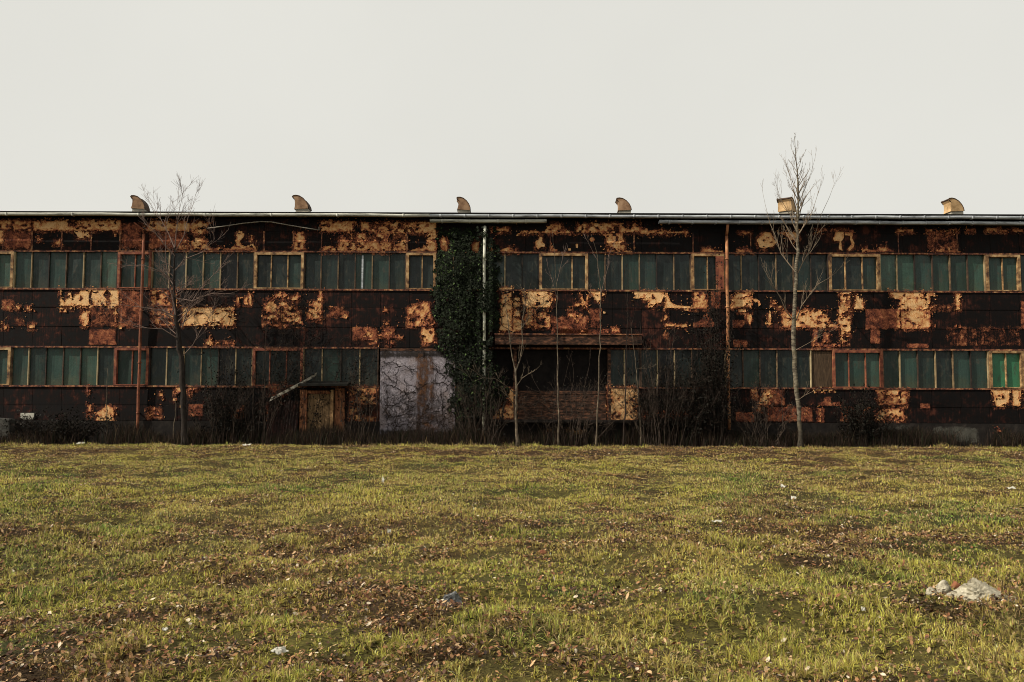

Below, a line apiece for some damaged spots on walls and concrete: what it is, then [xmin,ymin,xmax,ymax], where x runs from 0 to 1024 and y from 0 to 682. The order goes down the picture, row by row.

peeling [290,218,450,255]
peeling [57,285,122,329]
rust [89,290,140,345]
peeling [147,285,333,347]
rust [327,307,395,340]
peeling [632,289,710,338]
peeling [730,288,865,349]
rust [865,309,898,344]
peeling [887,288,962,332]
rust [947,301,1024,346]
crack [380,360,454,431]
rust [767,389,860,422]